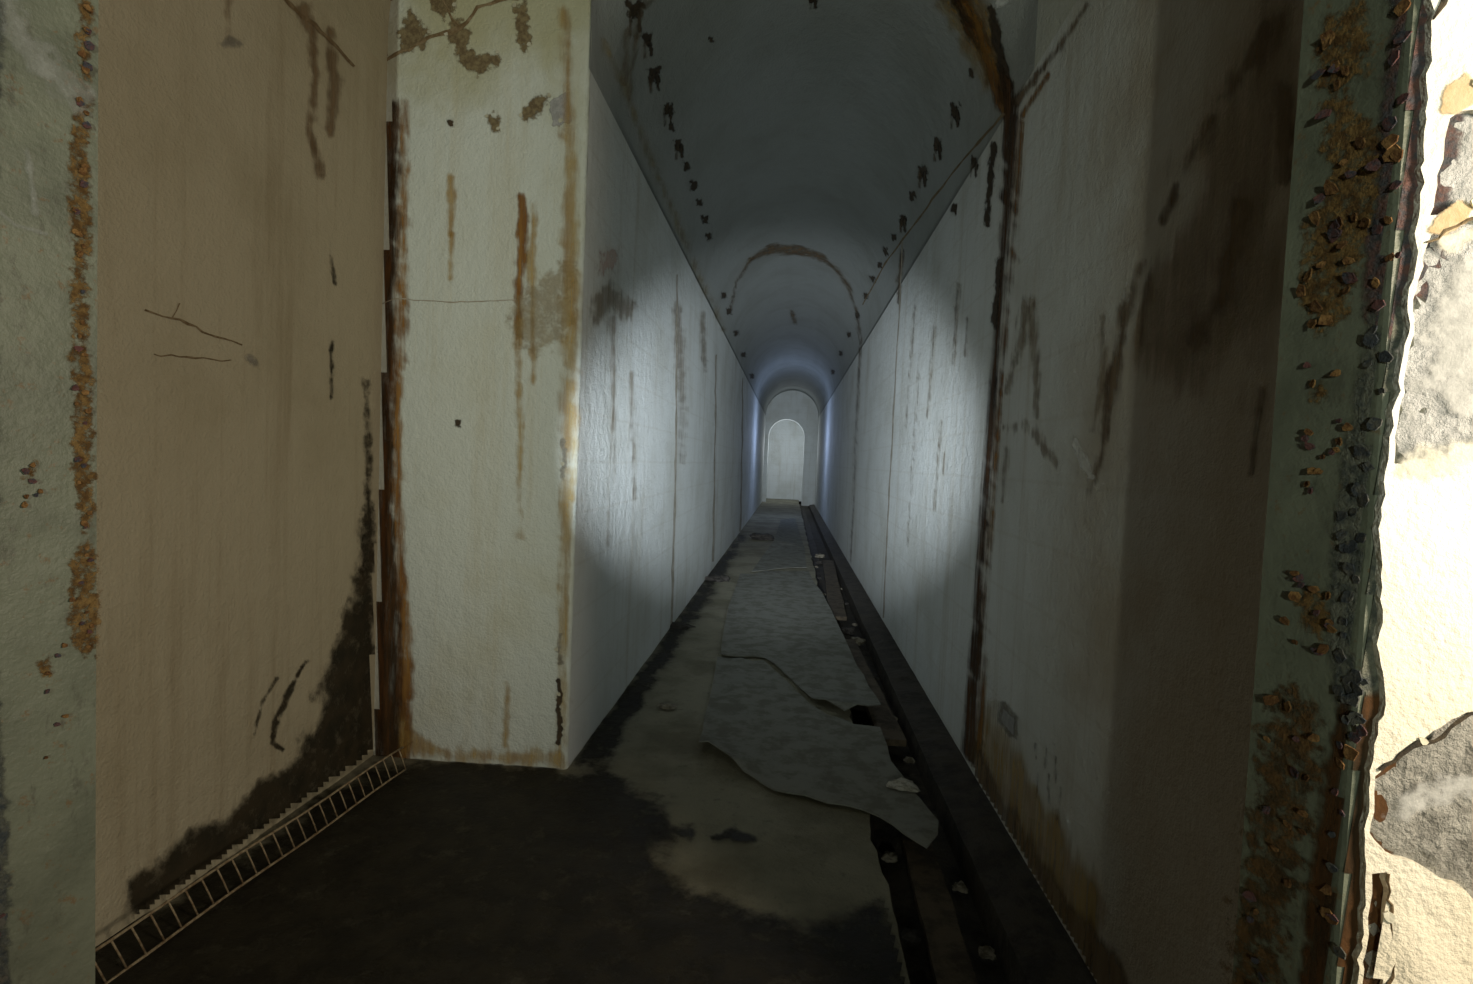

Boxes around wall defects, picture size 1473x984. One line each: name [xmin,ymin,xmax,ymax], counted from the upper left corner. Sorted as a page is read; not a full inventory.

corrosion [37,0,102,694]
corrosion [374,101,414,759]
crack [285,0,518,67]
flaking render [387,0,501,74]
flaking render [484,110,500,132]
flaking render [512,0,532,52]
corrosion [515,194,536,397]
peeling [519,92,571,126]
corrosion [720,102,961,378]
corrosion [941,0,1088,764]
flaking render [1300,0,1473,984]
leakage [95,408,905,984]